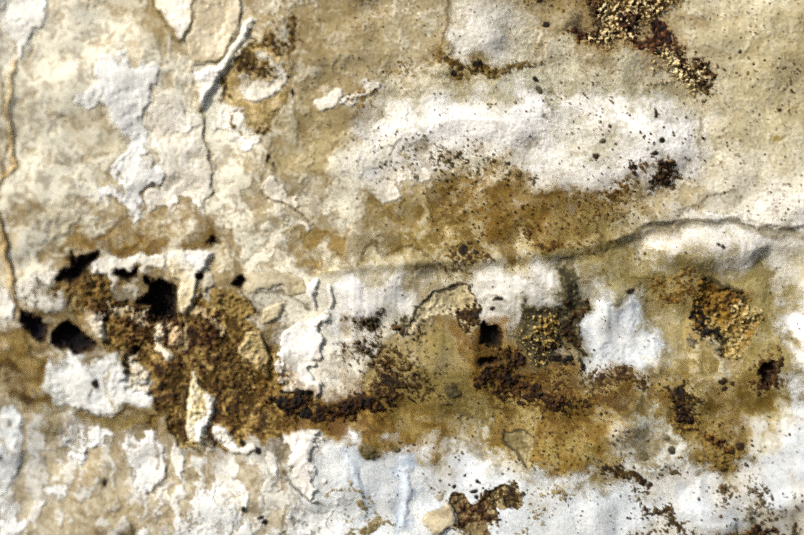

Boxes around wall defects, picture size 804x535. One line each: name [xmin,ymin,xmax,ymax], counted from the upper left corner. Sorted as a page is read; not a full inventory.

peeling [0,0,47,59]
peeling [73,0,300,223]
damp [180,213,218,250]
crack [622,194,804,239]
flaking render [0,253,406,535]
damp [289,153,804,535]